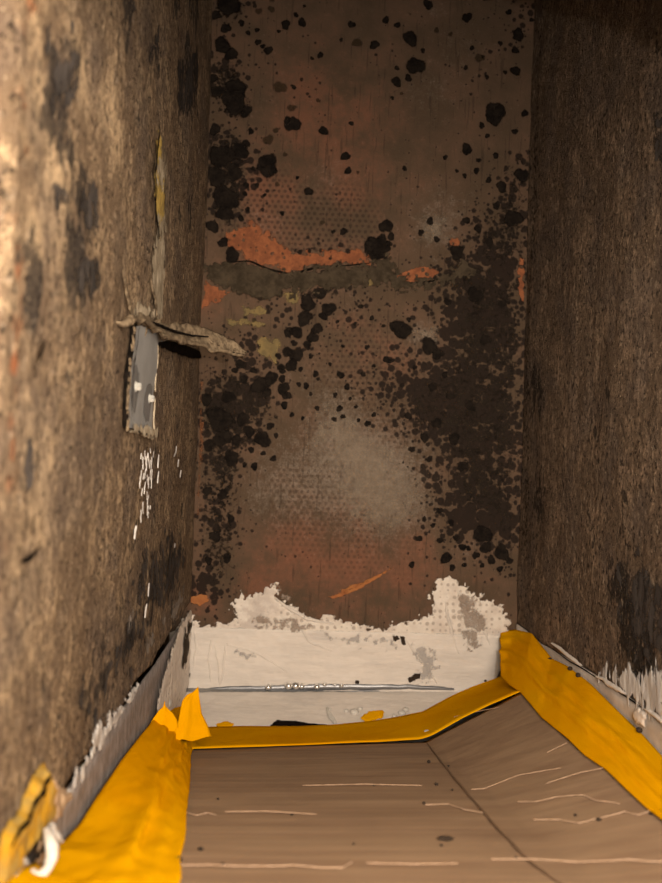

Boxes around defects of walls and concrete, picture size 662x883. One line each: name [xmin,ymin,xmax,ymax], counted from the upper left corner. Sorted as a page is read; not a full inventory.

mould [45,23,81,115]
damp [178,44,199,124]
mould [382,16,426,100]
mould [205,0,306,263]
mould [53,182,69,210]
crack [155,133,171,237]
damp [69,253,101,300]
peeling [116,316,133,328]
damp [312,84,540,572]
damp [20,437,35,492]
damp [199,288,339,581]
damp [612,545,662,682]